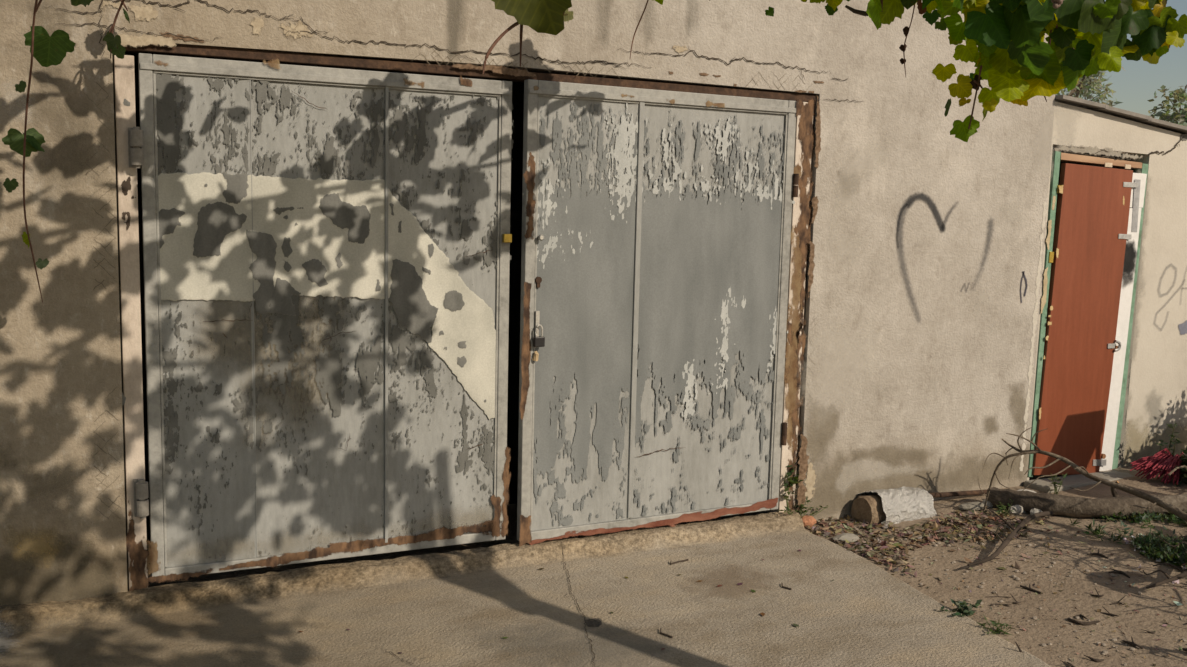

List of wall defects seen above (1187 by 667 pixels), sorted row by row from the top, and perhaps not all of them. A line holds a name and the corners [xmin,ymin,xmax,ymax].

crack [43,0,861,290]
corrosion [784,99,815,510]
water stain [807,202,1047,513]
water stain [0,536,114,606]
corrosion [126,501,150,591]
crack [561,539,595,667]